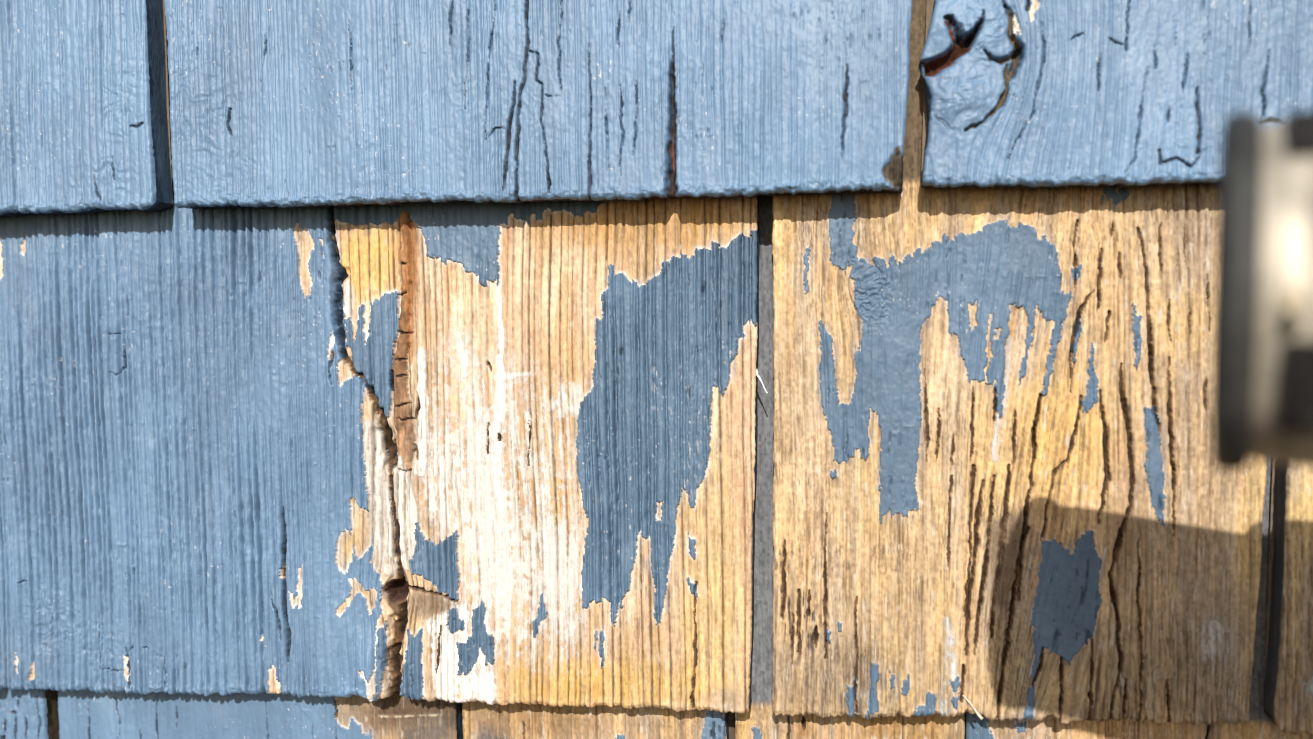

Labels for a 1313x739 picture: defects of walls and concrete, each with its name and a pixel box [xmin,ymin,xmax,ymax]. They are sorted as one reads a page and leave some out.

crack [449,0,638,201]
crack [666,30,677,199]
crack [944,0,1202,173]
crack [1248,9,1280,124]
crack [327,206,457,695]
peeling [294,0,1313,739]
crack [924,220,1211,723]